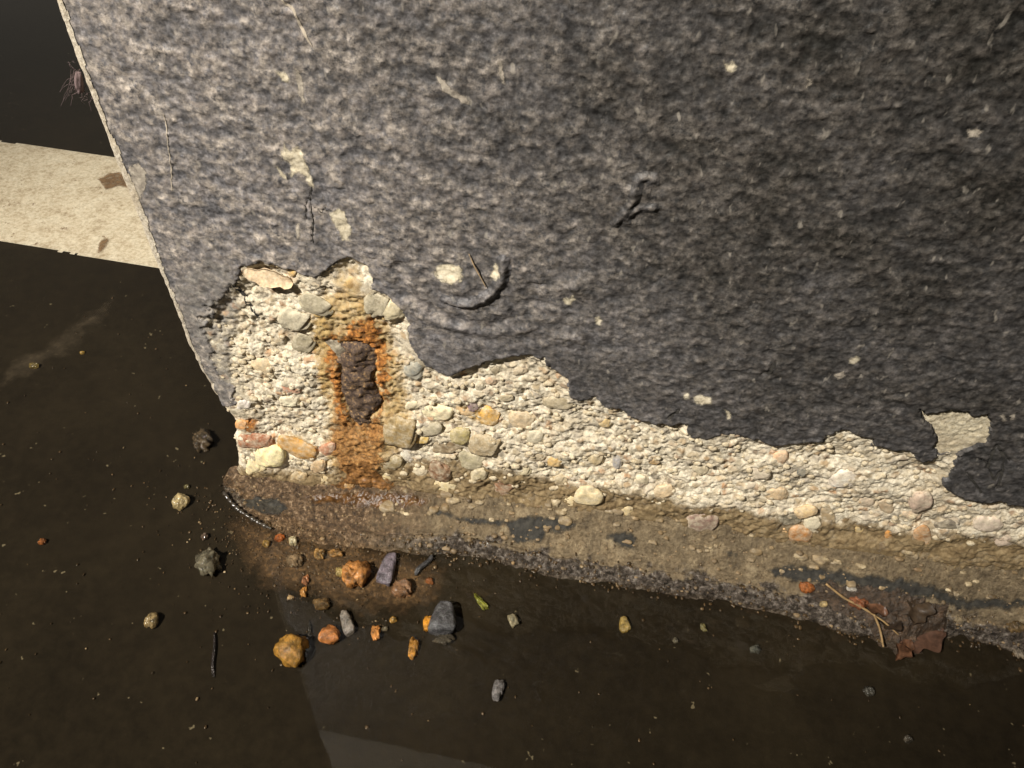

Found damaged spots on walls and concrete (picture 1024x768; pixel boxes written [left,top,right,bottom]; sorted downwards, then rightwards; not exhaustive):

spalling [57,0,1024,547]
corrosion [313,278,426,508]
leakage [243,496,287,515]
leakage [436,511,575,543]
leakage [607,532,636,548]
leakage [771,565,1024,610]